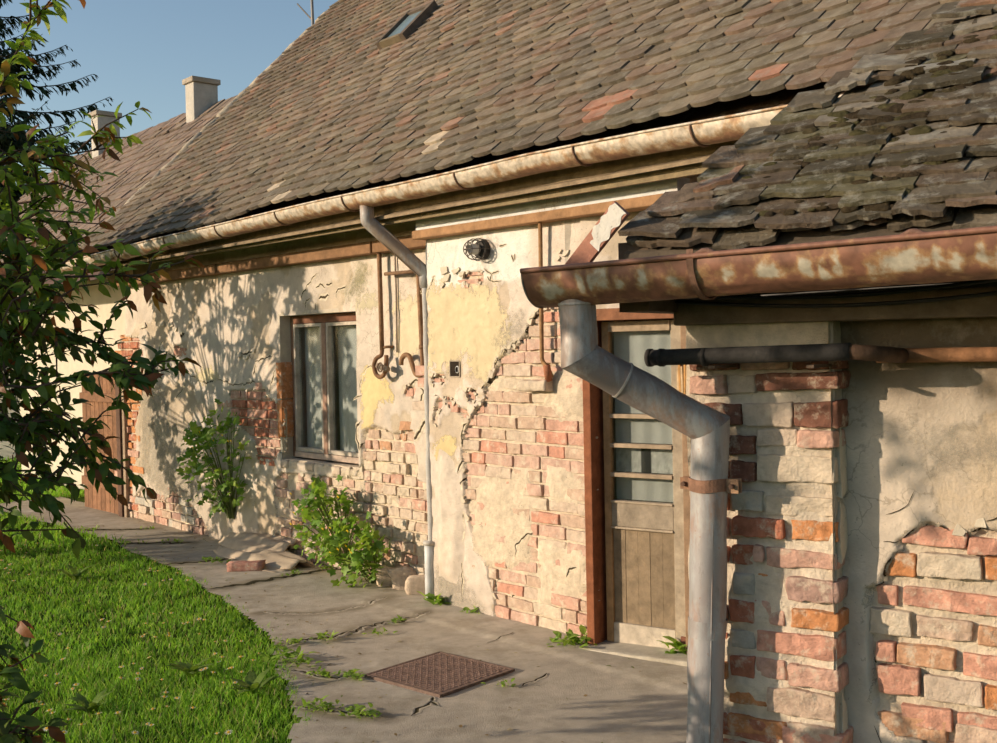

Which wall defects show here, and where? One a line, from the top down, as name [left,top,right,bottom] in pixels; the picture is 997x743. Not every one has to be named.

spalling [115,321,187,368]
crack [301,273,347,310]
spalling [114,387,209,536]
spalling [218,266,587,637]
spalling [862,517,997,743]